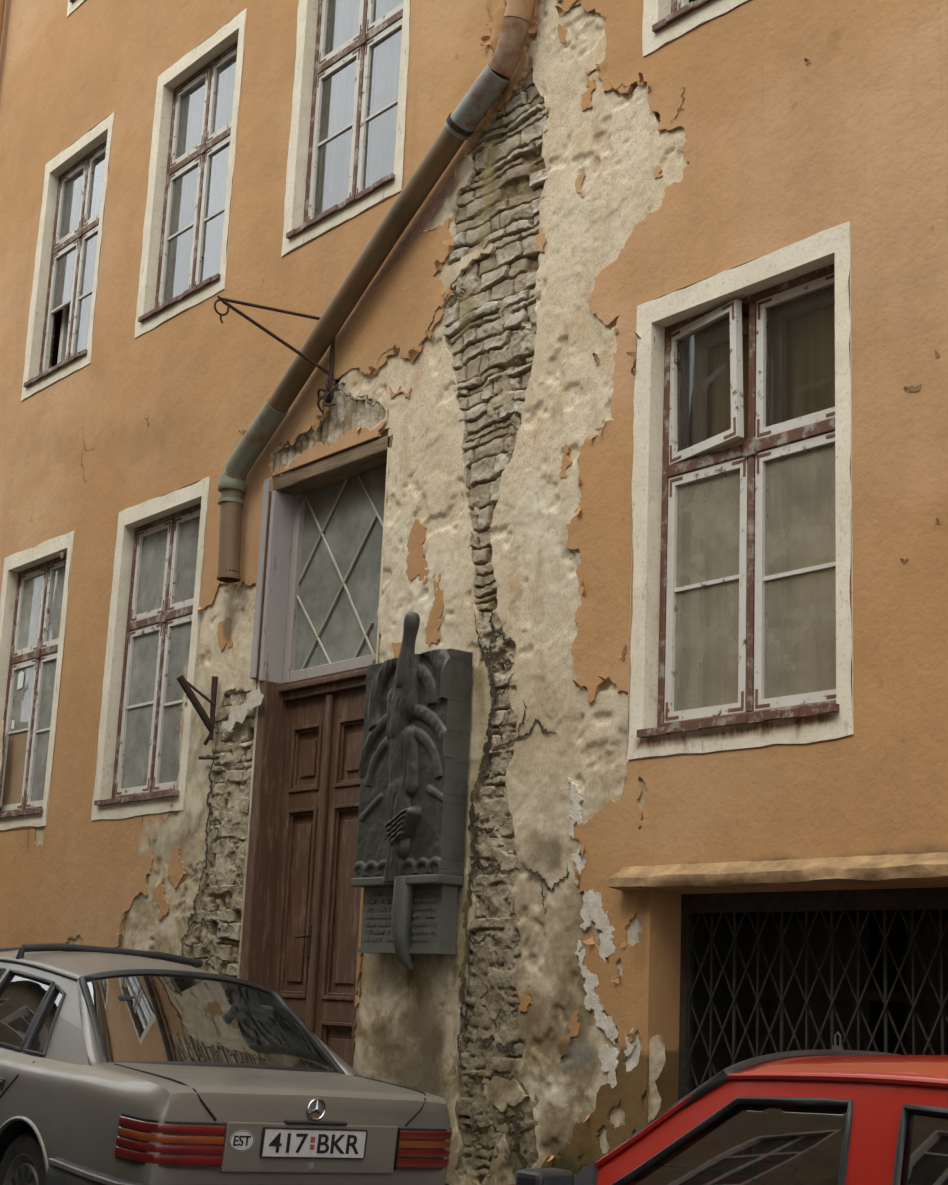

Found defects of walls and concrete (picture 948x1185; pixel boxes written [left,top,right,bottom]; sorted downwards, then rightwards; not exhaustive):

peeling [116,580,264,978]
peeling [270,0,690,1185]
crack [456,609,569,1169]